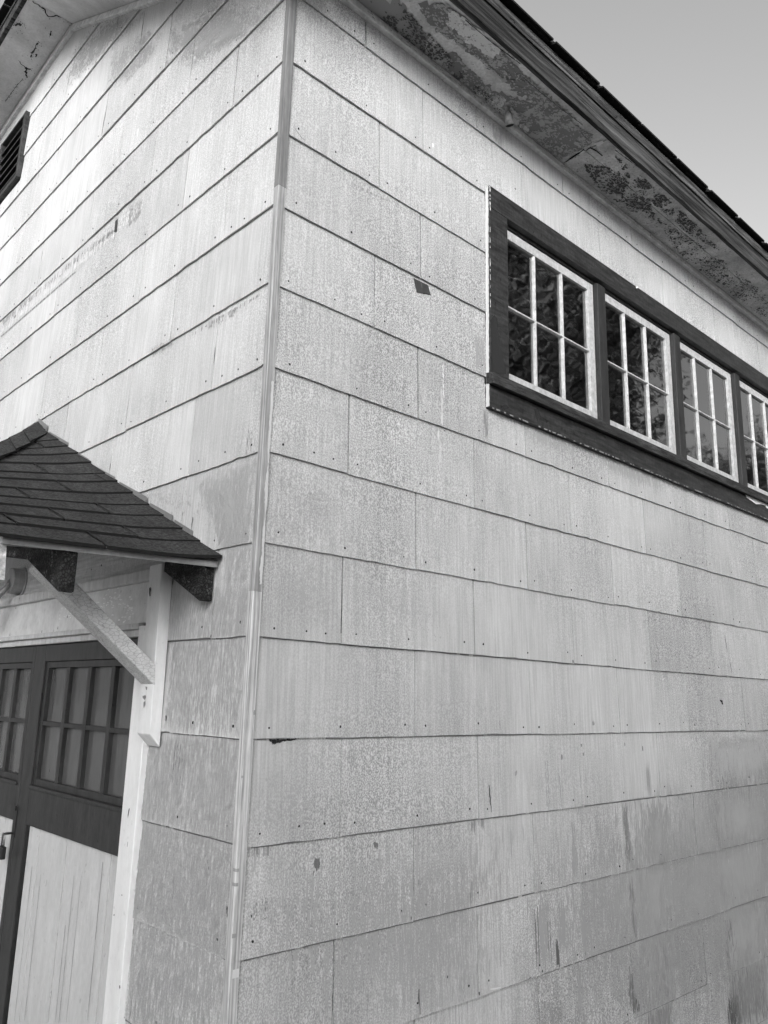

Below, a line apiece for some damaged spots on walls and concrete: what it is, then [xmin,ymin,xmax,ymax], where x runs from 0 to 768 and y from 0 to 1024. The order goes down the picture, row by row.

peeling [485,186,506,407]
peeling [358,0,768,321]
damp [635,733,768,1024]